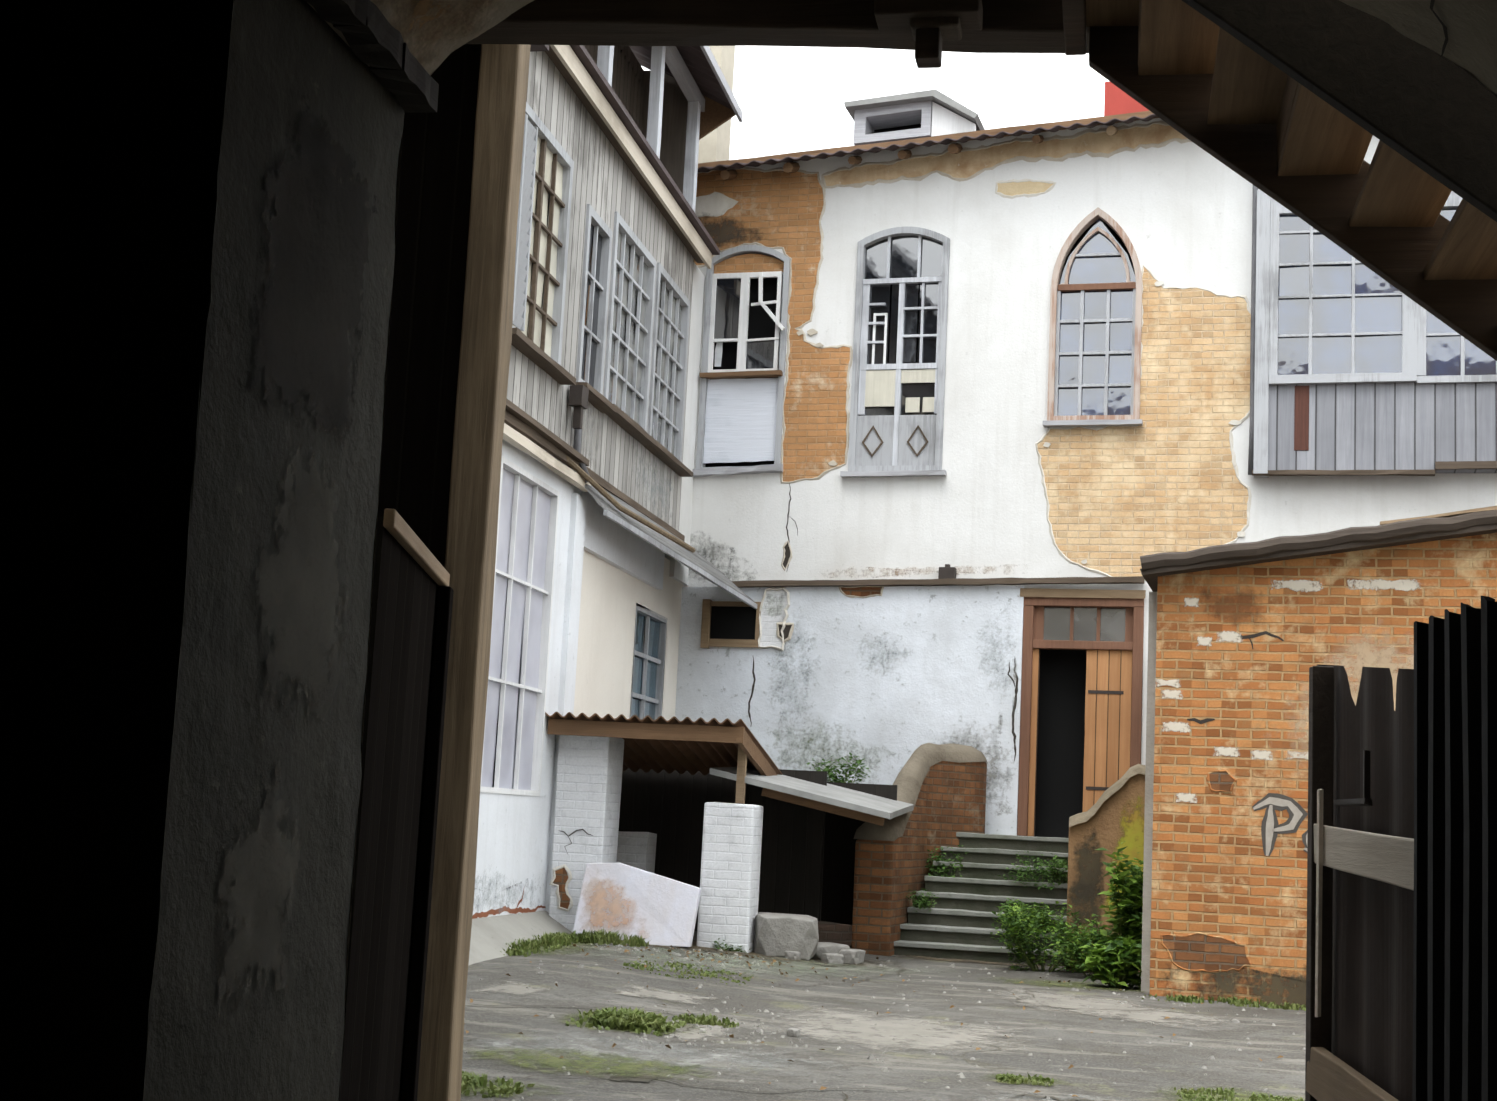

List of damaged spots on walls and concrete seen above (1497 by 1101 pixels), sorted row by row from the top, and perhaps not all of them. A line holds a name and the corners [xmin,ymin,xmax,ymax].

crack [1430,0,1448,56]
flaking render [694,121,1192,484]
flaking render [1035,264,1252,581]
crack [786,484,798,570]
crack [1238,631,1284,649]
crack [1007,659,1018,761]
damp [943,737,1009,797]
spalling [1160,932,1253,973]